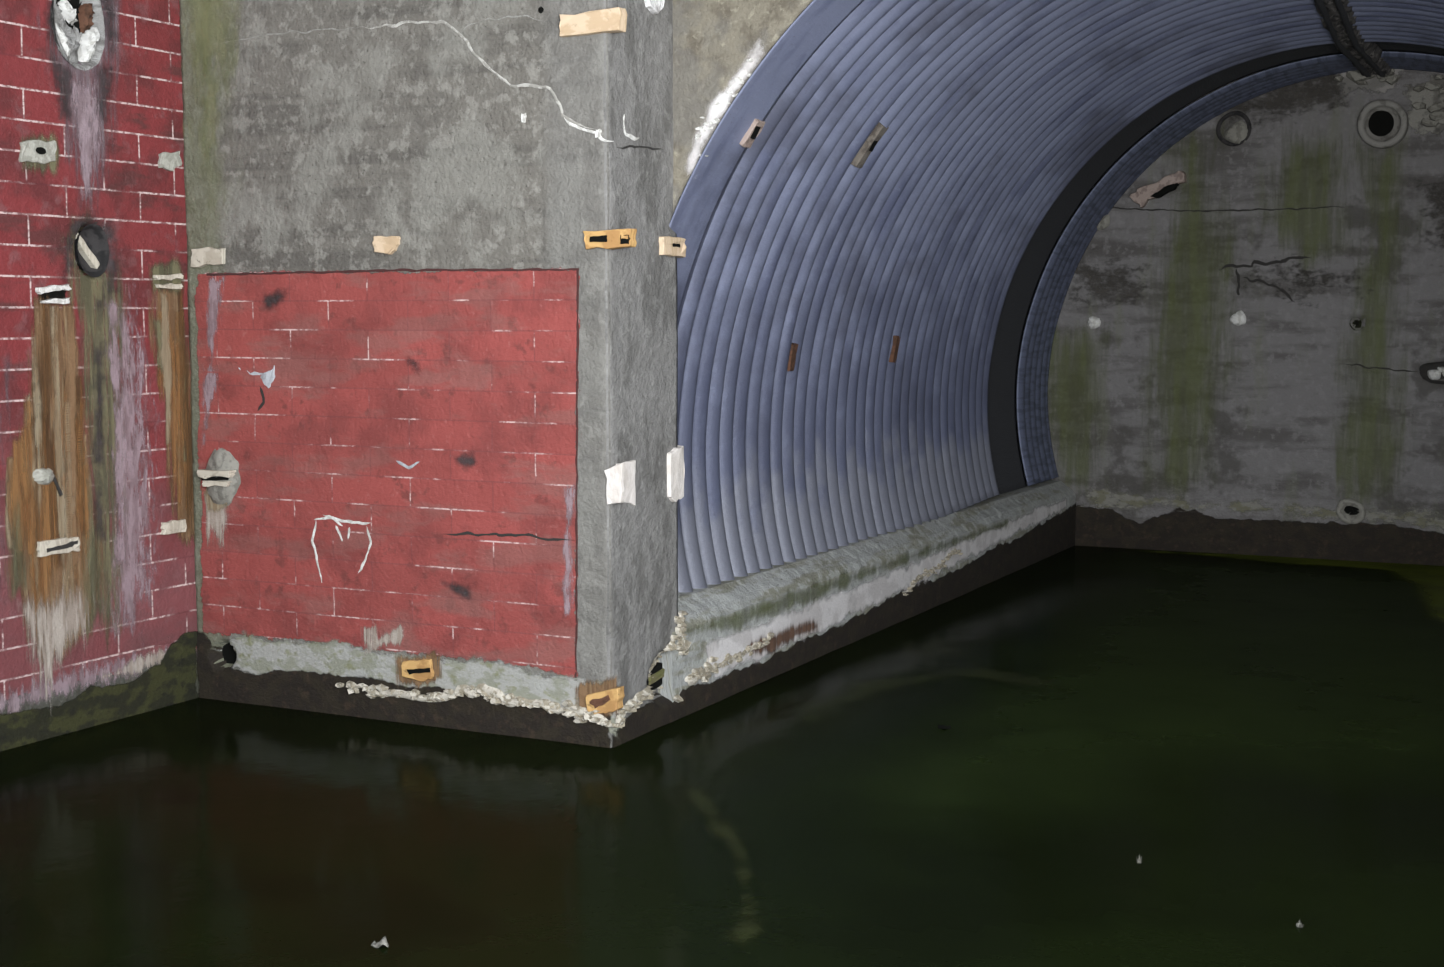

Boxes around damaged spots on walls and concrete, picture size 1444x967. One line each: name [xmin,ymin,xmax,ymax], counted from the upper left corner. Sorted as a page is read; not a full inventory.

leakage [49,0,119,198]
crack [214,15,663,150]
crack [1219,256,1310,302]
rust [149,288,195,545]
rust [5,298,103,698]
crack [447,531,575,541]
peeling [902,548,963,596]
peeling [335,610,774,728]